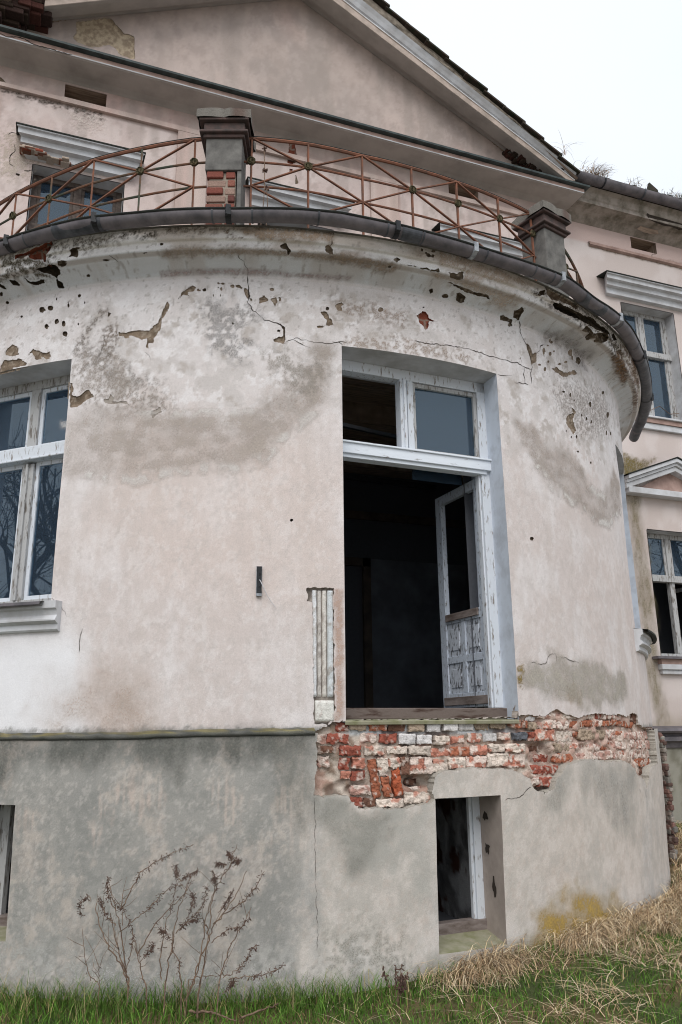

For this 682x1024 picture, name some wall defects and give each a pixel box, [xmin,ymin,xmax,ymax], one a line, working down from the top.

flaking render [73,17,135,59]
crack [238,256,346,348]
flaking render [317,302,434,330]
flaking render [0,344,51,375]
flaking render [67,282,281,418]
crack [417,321,543,385]
flaking render [520,339,581,377]
water stain [63,346,330,484]
flaking render [557,391,611,453]
water stain [522,657,627,706]
flaking render [314,705,679,867]